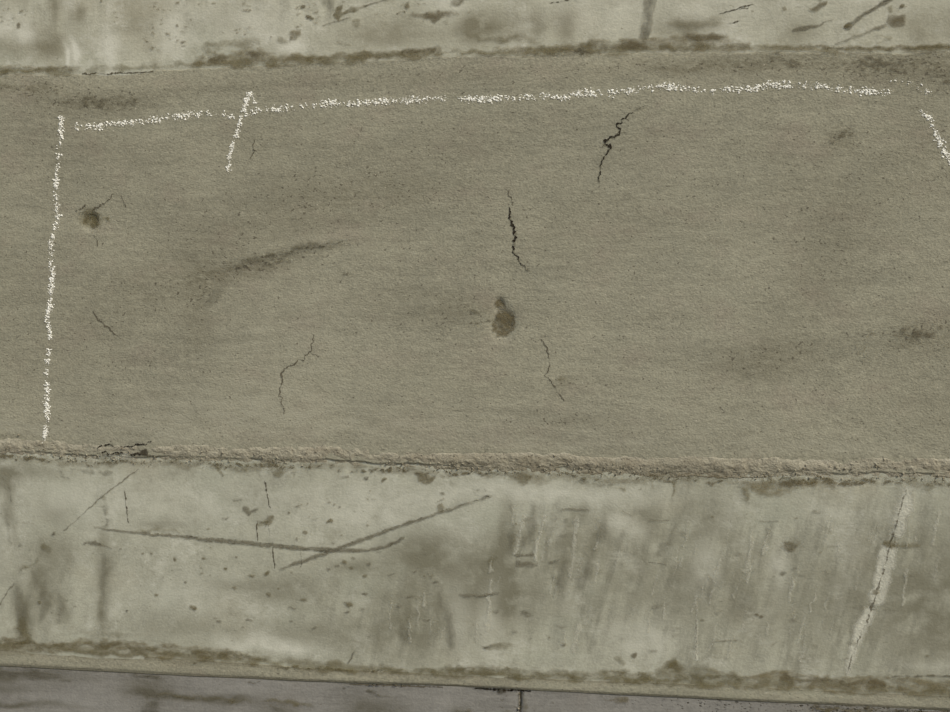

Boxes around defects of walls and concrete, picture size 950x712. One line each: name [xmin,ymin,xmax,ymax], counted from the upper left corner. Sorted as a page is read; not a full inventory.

crack [598,112,634,182]
crack [507,190,527,271]
crack [278,334,319,411]